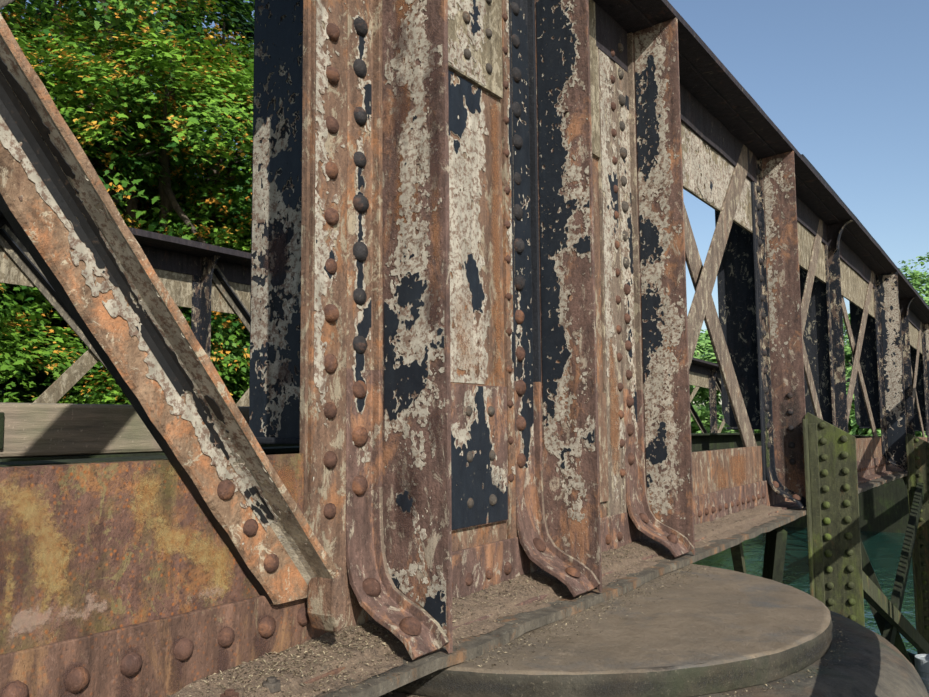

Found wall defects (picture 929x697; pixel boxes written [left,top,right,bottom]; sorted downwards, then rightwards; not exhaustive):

peeling [0,0,303,538]
corrosion [265,235,287,274]
peeling [313,0,345,427]
peeling [349,256,371,415]
peeling [384,0,595,530]
peeling [599,27,734,522]
peeling [734,178,752,231]
peeling [763,158,800,363]
peeling [879,274,907,465]
corrosion [2,487,71,613]
corrosion [133,481,228,596]
peeling [387,479,447,634]